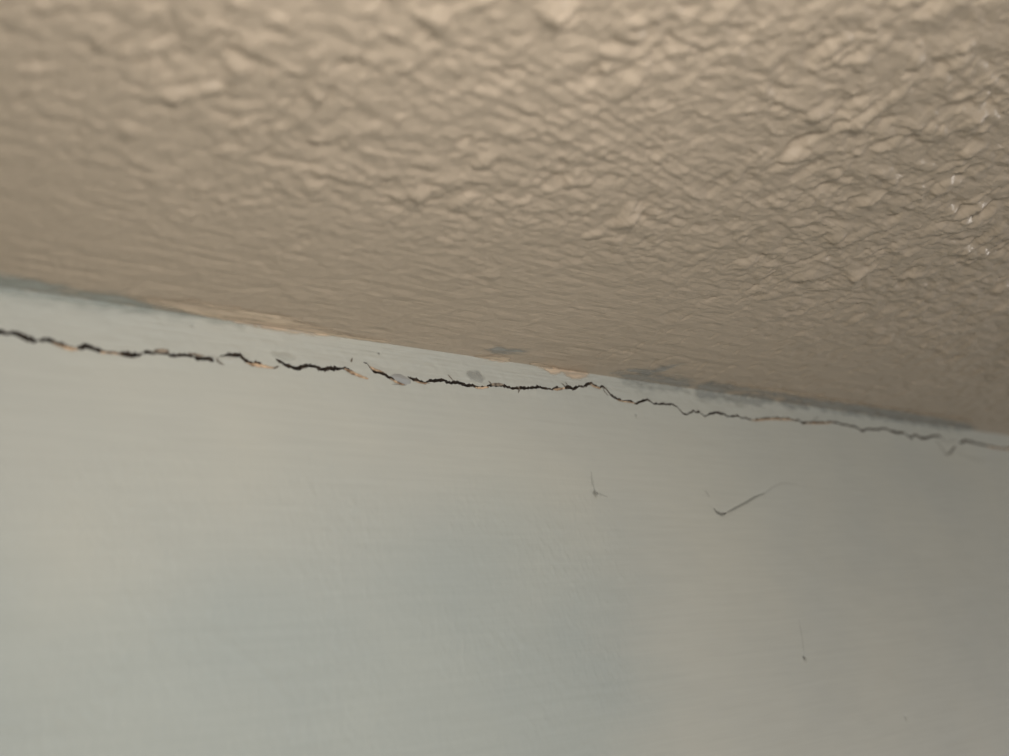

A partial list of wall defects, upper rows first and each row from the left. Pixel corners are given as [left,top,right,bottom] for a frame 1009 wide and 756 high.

crack [0,329,1009,454]